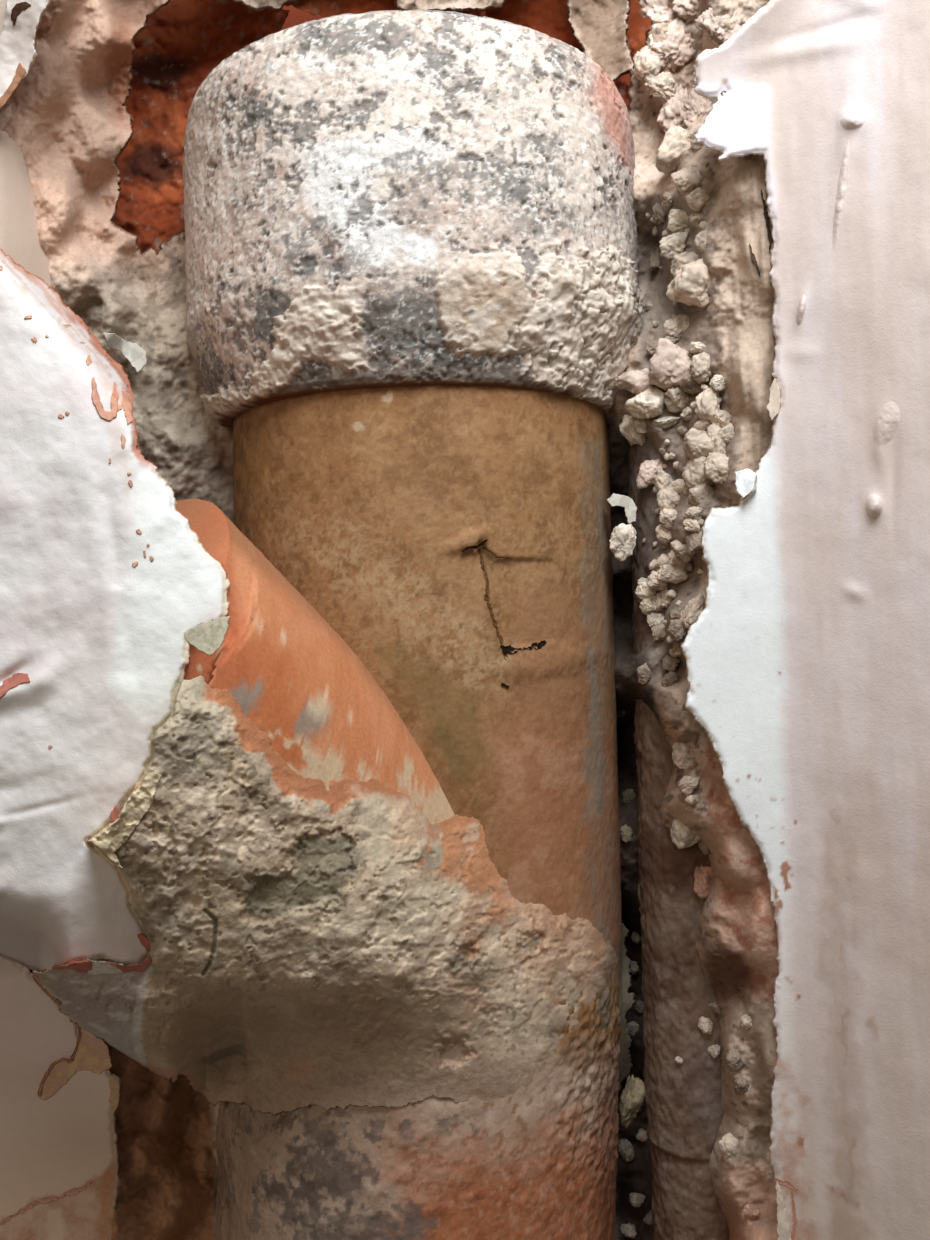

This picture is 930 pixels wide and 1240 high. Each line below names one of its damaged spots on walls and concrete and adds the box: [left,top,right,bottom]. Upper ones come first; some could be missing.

flaking render [447,0,583,52]
flaking render [627,0,652,57]
peeling [0,0,50,130]
flaking render [614,74,631,110]
flaking render [112,0,396,253]
spalling [103,332,147,373]
spalling [766,378,781,420]
peeling [37,1026,120,1111]
peeling [775,1182,791,1240]